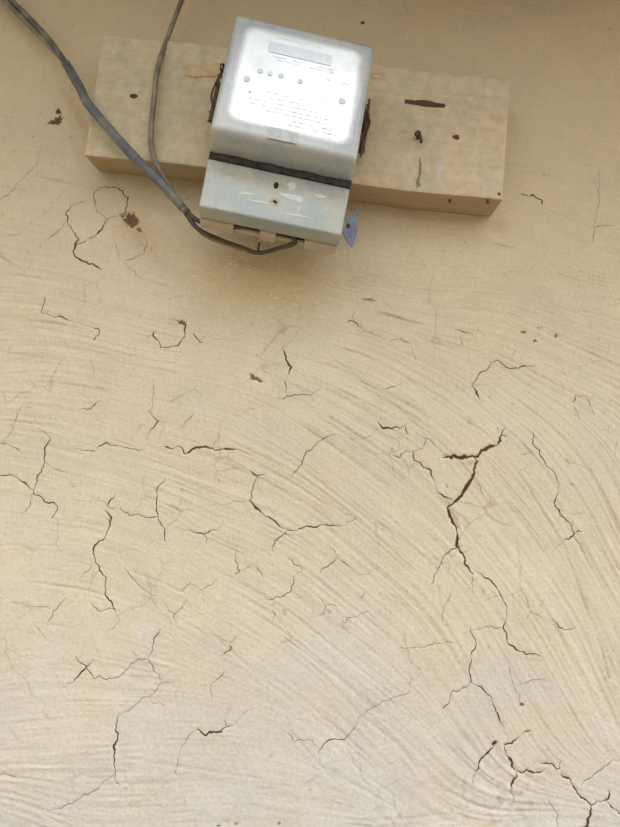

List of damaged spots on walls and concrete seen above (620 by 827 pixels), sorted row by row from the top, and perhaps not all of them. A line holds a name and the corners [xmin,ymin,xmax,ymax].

crack [45,186,129,270]
crack [41,299,100,341]
crack [147,319,218,348]
crack [278,350,320,399]
crack [472,360,536,400]
crack [0,429,64,518]
crack [74,381,357,631]
crack [266,547,381,634]
crack [288,423,620,827]
crack [57,551,263,809]